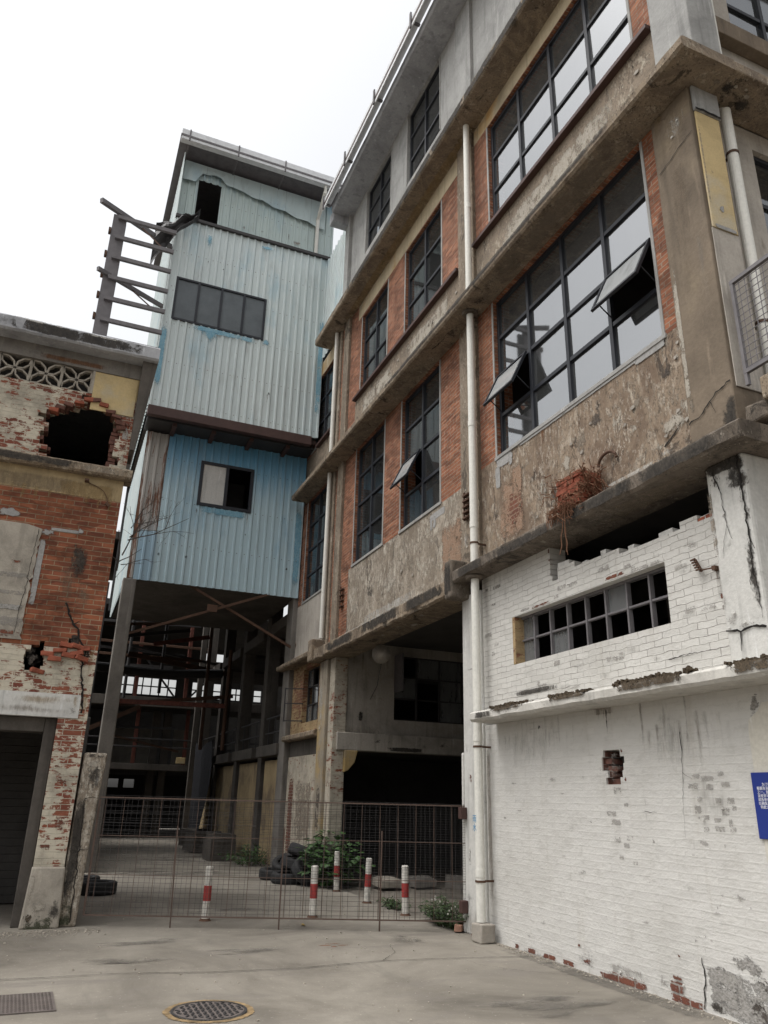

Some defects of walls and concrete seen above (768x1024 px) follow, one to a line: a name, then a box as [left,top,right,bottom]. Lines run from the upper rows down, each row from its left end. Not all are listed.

spalling [34,396,130,467]
peeling [561,393,643,470]
crack [664,379,730,447]
flaking render [500,462,539,539]
crack [669,455,767,660]
hole [28,635,91,675]
crack [65,602,91,713]
spalling [600,749,626,785]
spalling [515,943,591,967]
spalling [600,971,647,990]
crack [699,958,707,1009]
peeling [670,955,768,1024]